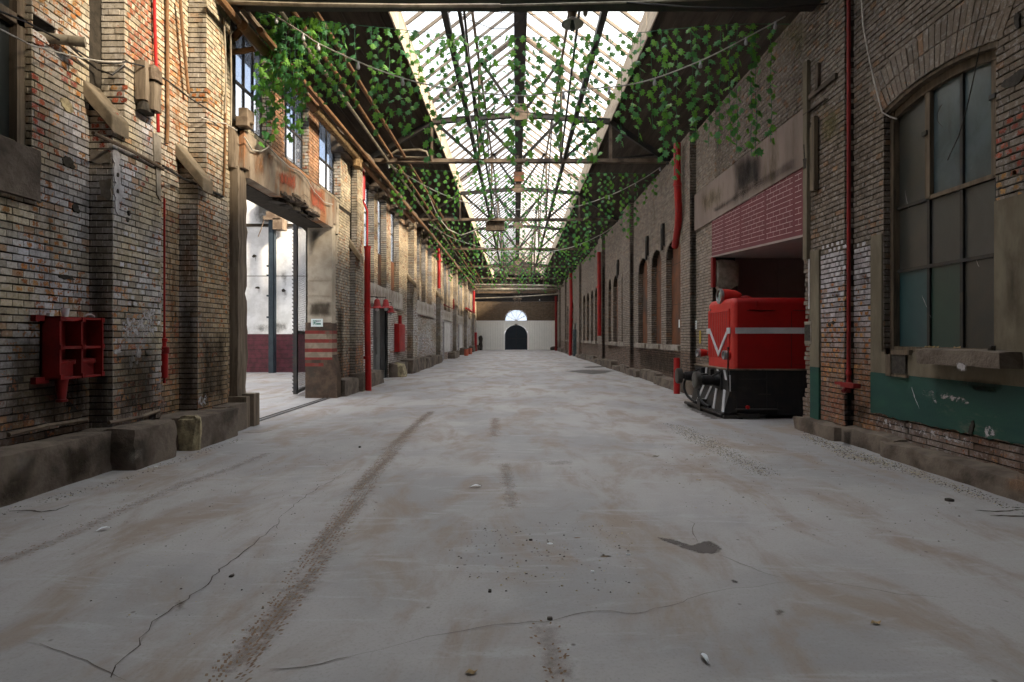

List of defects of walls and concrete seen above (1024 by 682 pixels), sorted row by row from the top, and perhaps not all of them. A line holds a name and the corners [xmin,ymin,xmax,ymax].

crack [40,473,344,679]
damp [658,537,721,554]